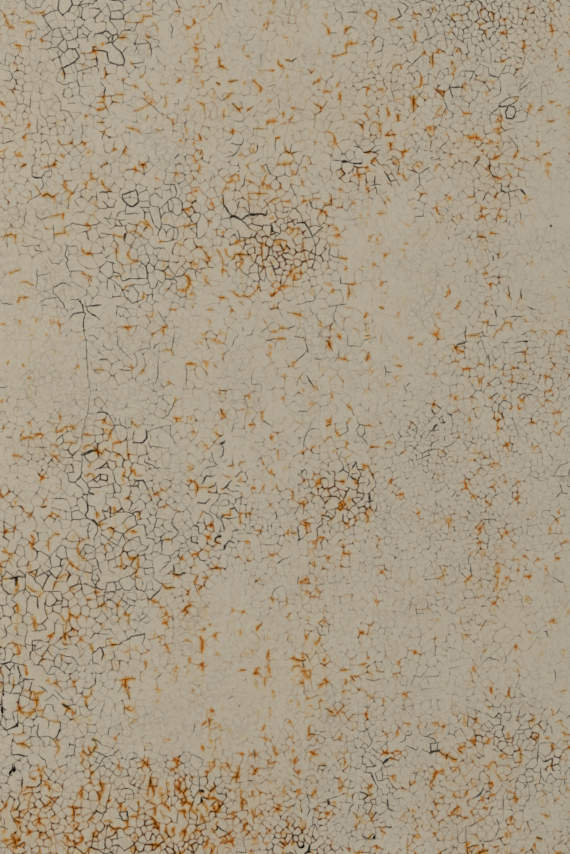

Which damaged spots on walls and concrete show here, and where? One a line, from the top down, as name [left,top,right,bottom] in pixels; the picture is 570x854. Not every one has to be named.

crack [6,0,534,398]
crack [452,233,570,445]
crack [0,406,570,854]